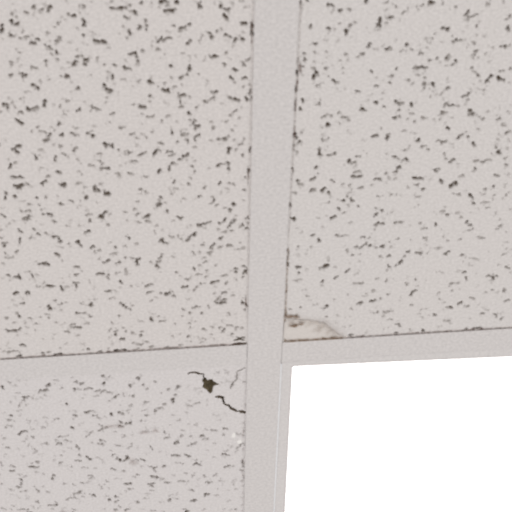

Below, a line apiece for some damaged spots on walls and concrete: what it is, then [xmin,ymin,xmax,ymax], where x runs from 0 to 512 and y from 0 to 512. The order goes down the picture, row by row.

crack [187,367,246,414]